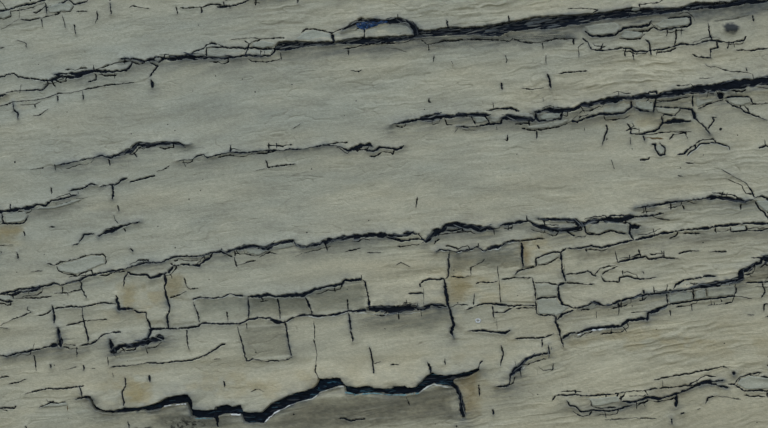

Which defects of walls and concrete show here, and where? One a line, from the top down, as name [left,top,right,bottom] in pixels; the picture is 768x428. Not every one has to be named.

crack [0,0,768,161]
crack [0,141,768,428]